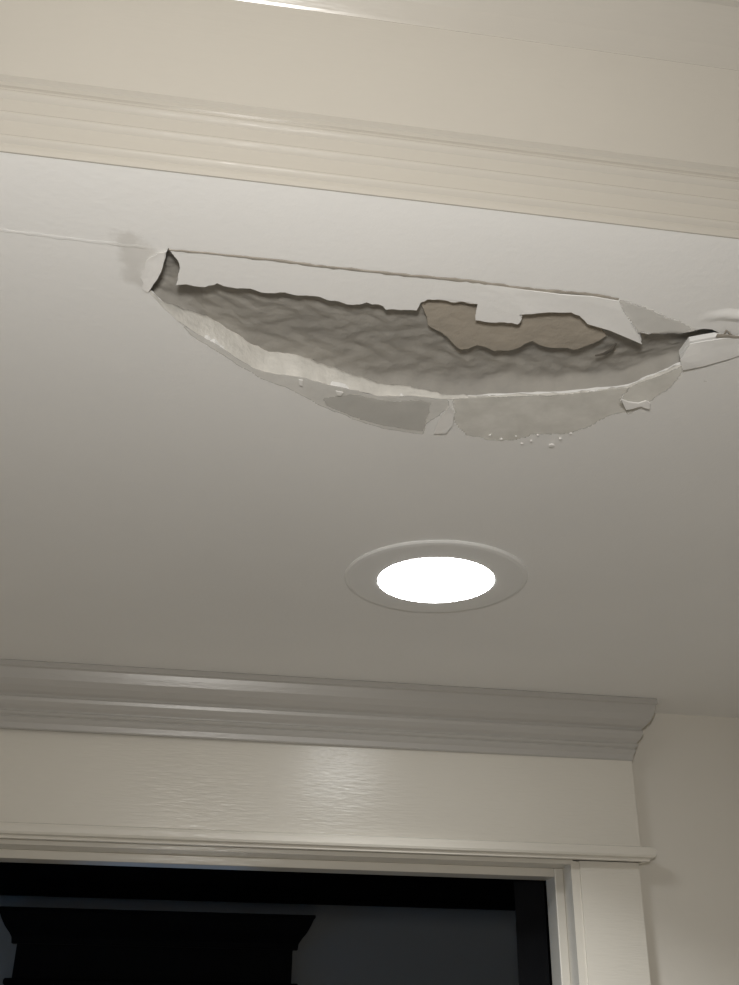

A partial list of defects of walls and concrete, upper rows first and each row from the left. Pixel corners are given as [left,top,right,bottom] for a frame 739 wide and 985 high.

peeling [423,279,642,344]